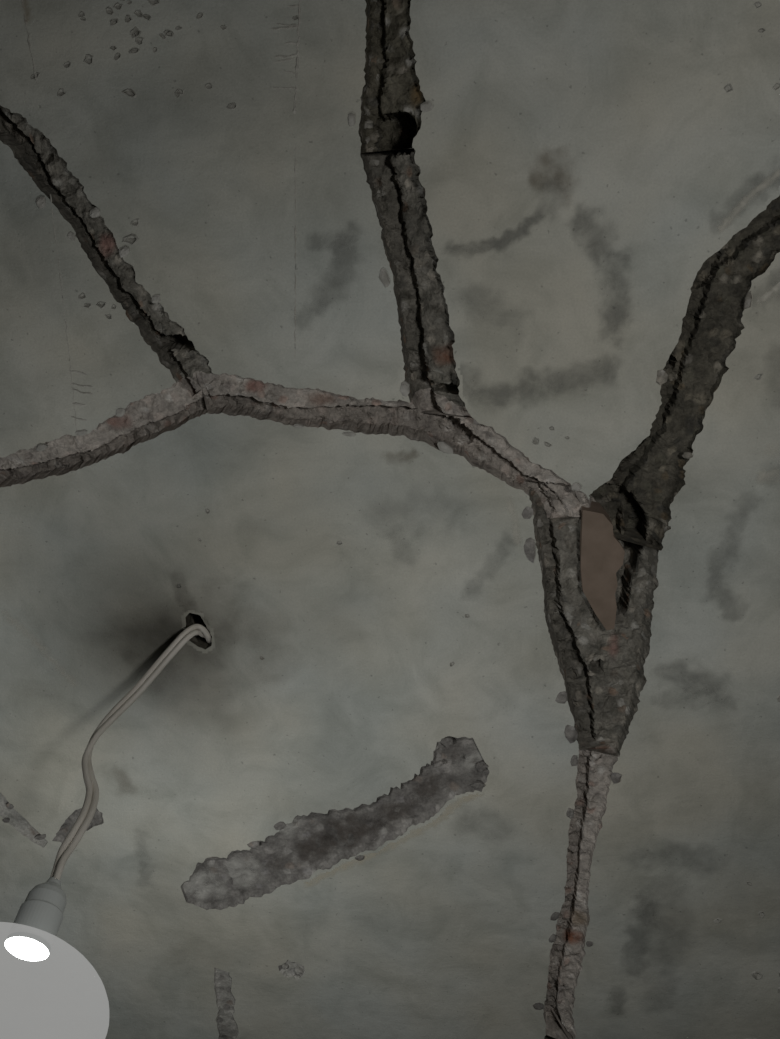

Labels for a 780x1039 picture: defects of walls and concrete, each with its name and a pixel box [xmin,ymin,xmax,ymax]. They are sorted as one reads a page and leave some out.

crack [0,0,780,630]
crack [0,793,48,848]
spalling [181,736,489,910]
crack [522,489,659,1039]
spalling [214,967,239,1039]